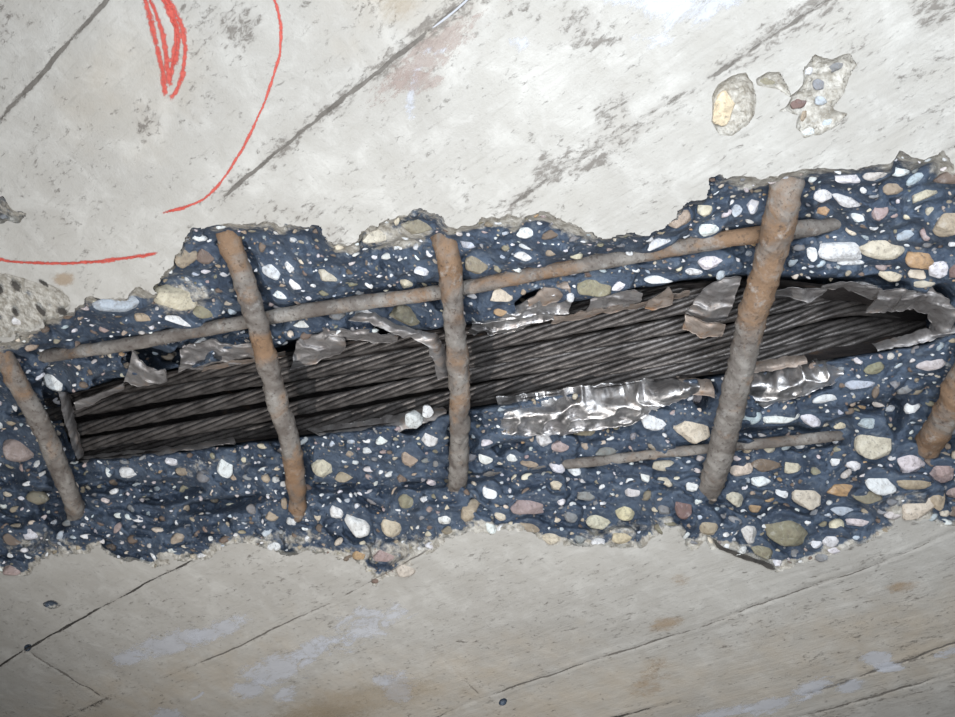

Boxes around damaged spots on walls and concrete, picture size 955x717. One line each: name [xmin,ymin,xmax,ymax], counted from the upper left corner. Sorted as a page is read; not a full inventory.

crack [1,0,109,118]
crack [226,0,469,196]
spalling [0,150,955,409]
spalling [0,322,955,586]
spalling [43,600,61,609]
crack [0,560,192,717]
crack [202,610,314,662]
crack [347,550,428,594]
crack [502,623,712,692]
crack [811,642,955,712]